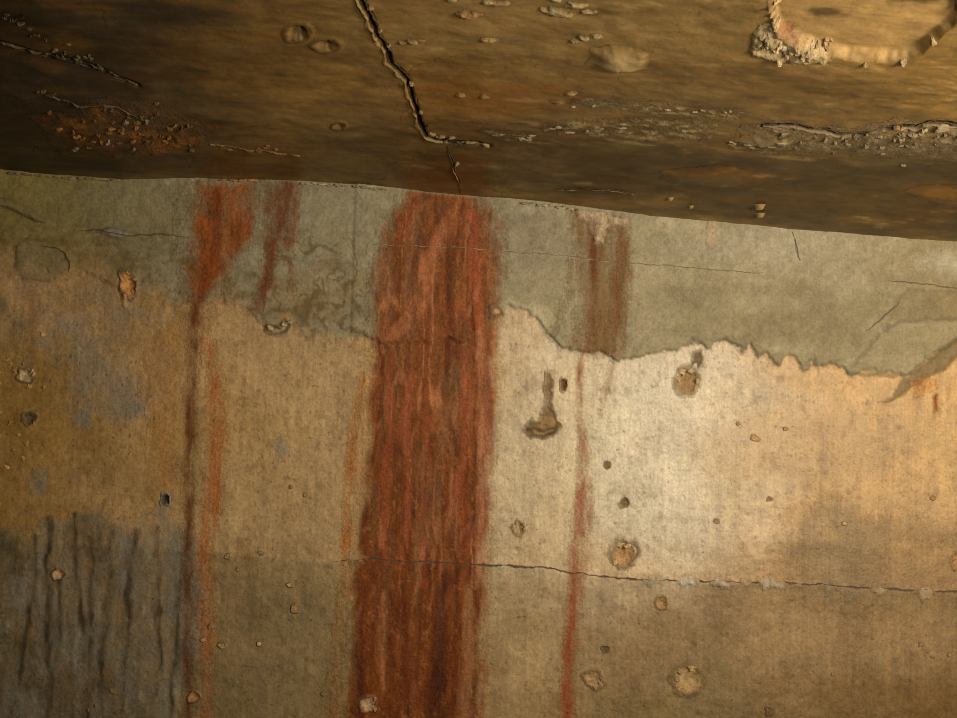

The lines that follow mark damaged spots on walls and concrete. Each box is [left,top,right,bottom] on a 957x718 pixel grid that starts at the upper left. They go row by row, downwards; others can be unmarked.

leakage [0,0,164,179]
crack [354,0,489,193]
leakage [478,97,744,144]
spalling [748,0,957,68]
flaking render [0,169,181,309]
flaking render [488,197,957,403]
leakage [0,269,185,718]
corrosion [169,126,314,718]
corrosion [324,146,520,718]
spalling [522,369,569,440]
corrosion [545,206,635,718]
crack [334,551,957,603]